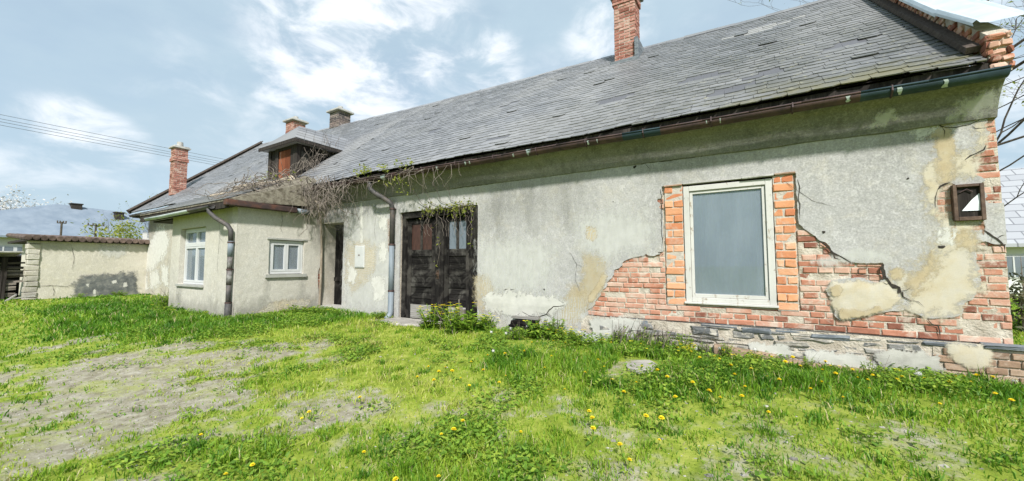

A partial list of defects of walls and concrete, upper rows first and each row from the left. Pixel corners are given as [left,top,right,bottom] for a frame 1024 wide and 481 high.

flaking render [572,92,1013,344]